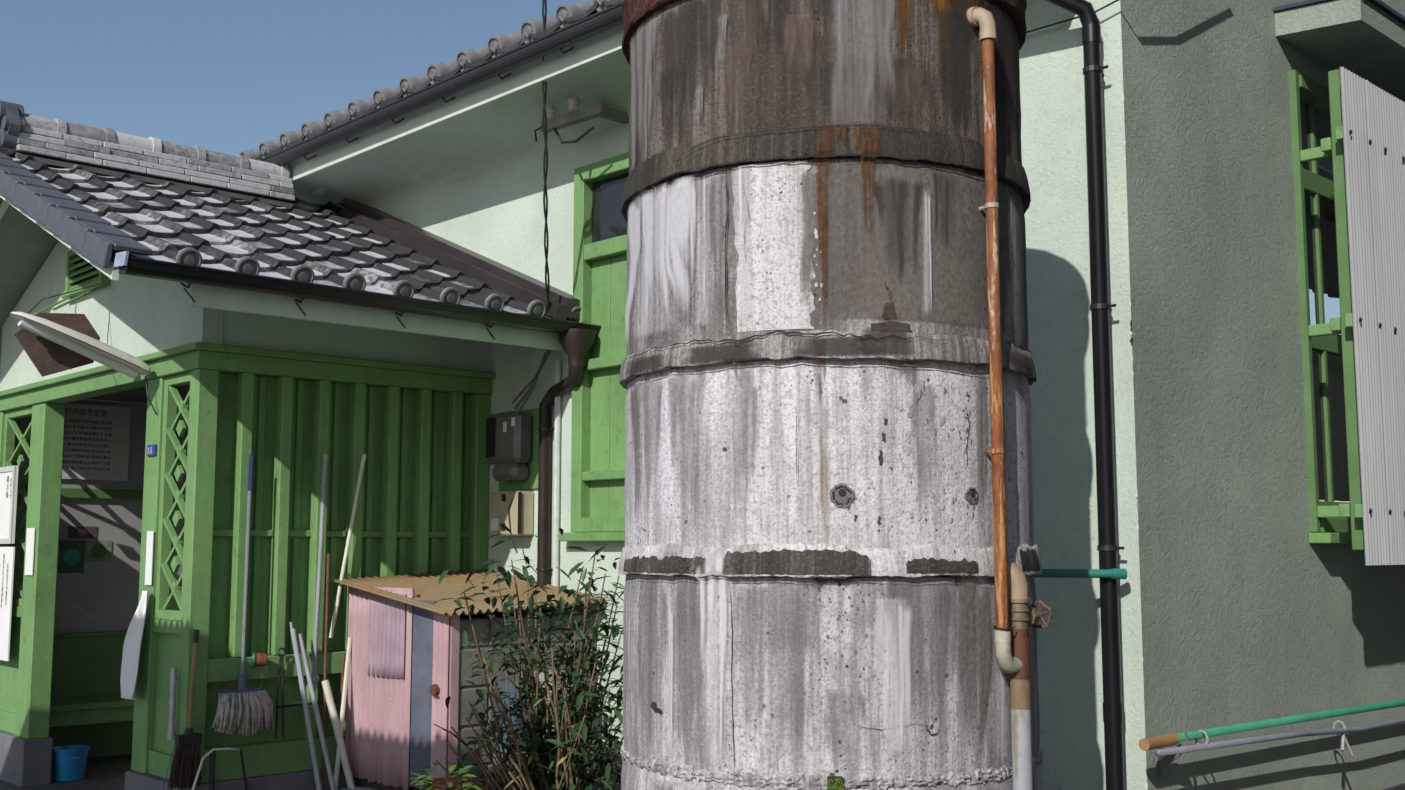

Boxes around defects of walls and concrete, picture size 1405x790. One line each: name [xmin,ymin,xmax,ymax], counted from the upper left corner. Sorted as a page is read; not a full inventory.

water stain [631,0,922,154]
rust [933,0,989,61]
water stain [990,7,1015,120]
water stain [626,177,705,332]
rust [816,119,879,296]
water stain [800,162,1012,422]
water stain [628,339,753,511]
water stain [742,389,755,475]
water stain [979,370,987,491]
water stain [696,555,727,740]
water stain [803,576,853,589]
water stain [877,600,910,746]